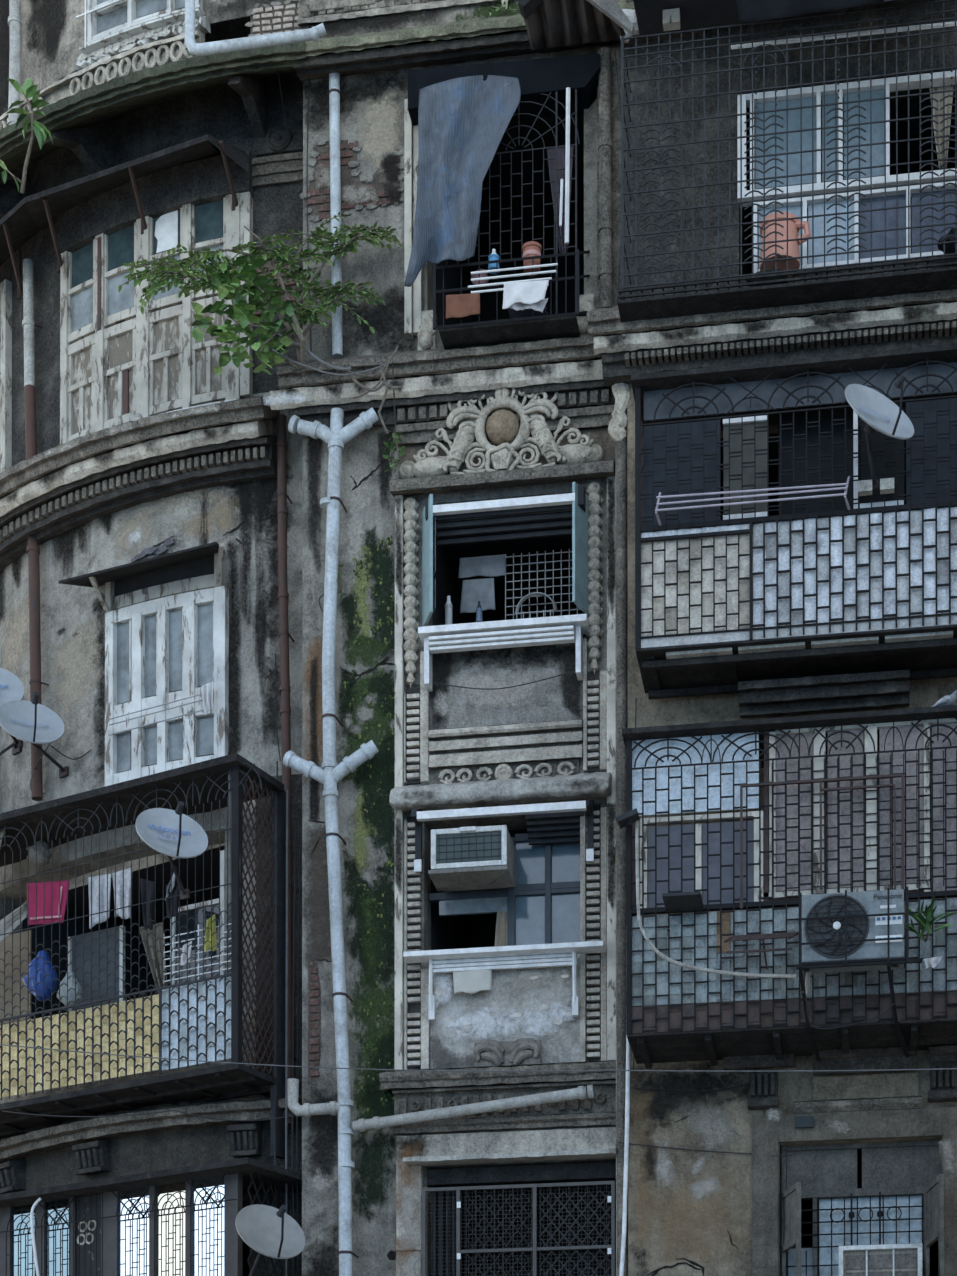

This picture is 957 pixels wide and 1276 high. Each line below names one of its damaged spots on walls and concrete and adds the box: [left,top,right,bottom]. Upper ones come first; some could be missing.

water stain [0,0,10,116]
water stain [28,0,66,59]
flaking render [299,94,404,248]
water stain [199,491,208,545]
water stain [227,463,289,755]
water stain [307,436,322,568]
water stain [339,431,402,668]
crack [646,1258,704,1276]